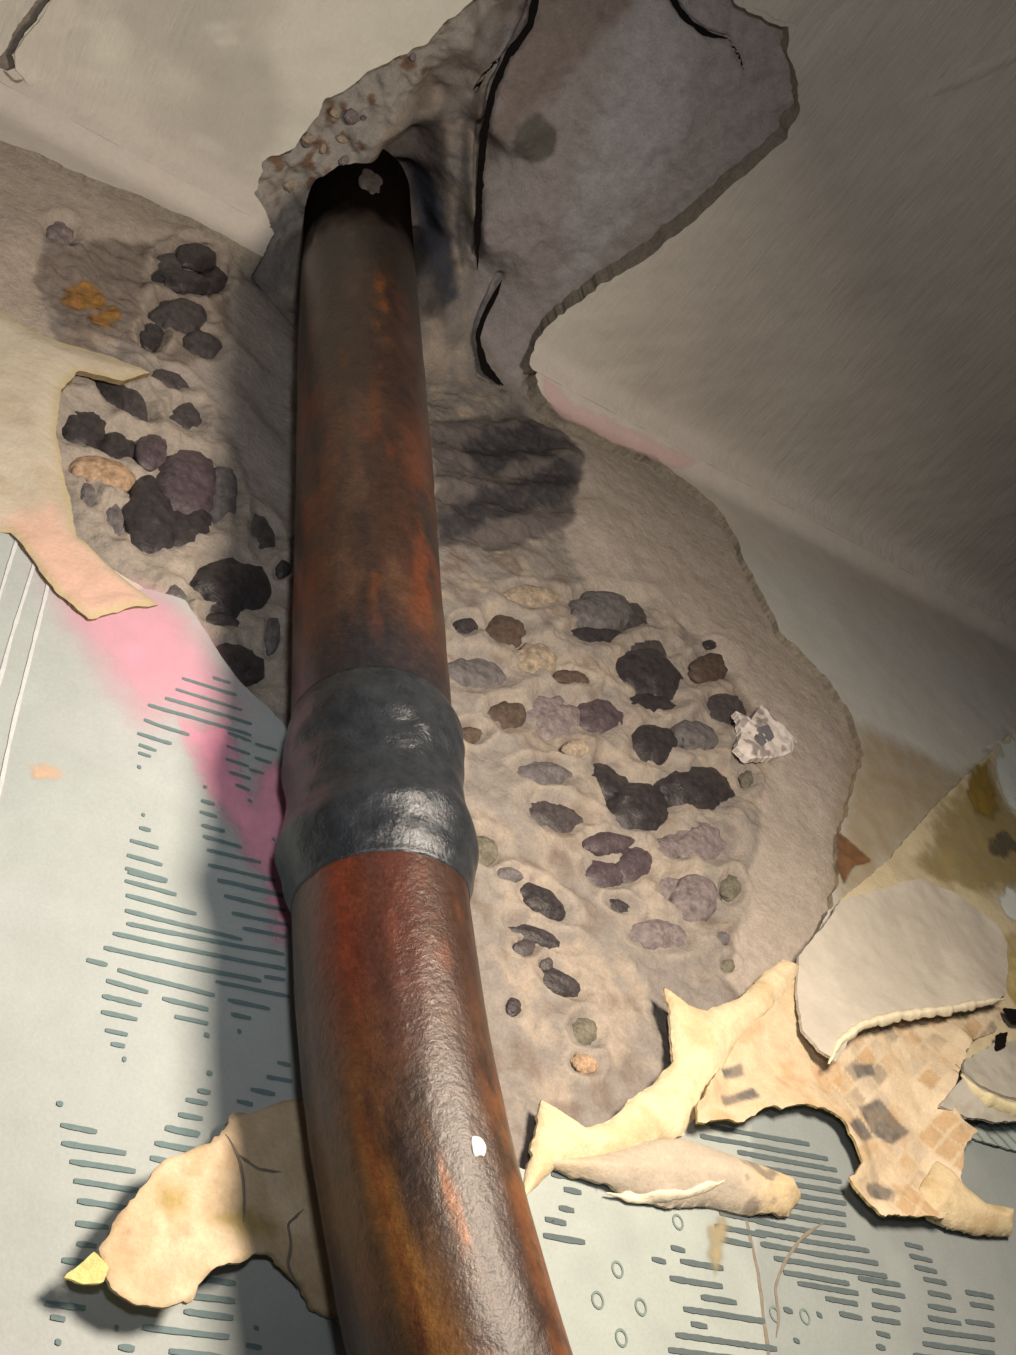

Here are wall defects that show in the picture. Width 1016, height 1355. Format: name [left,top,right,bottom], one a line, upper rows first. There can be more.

crack [0,0,76,84]
crack [671,0,744,70]
damp [515,115,556,161]
crack [473,0,539,385]
corrosion [62,281,121,327]
damp [439,423,574,537]
spalling [0,0,858,1170]